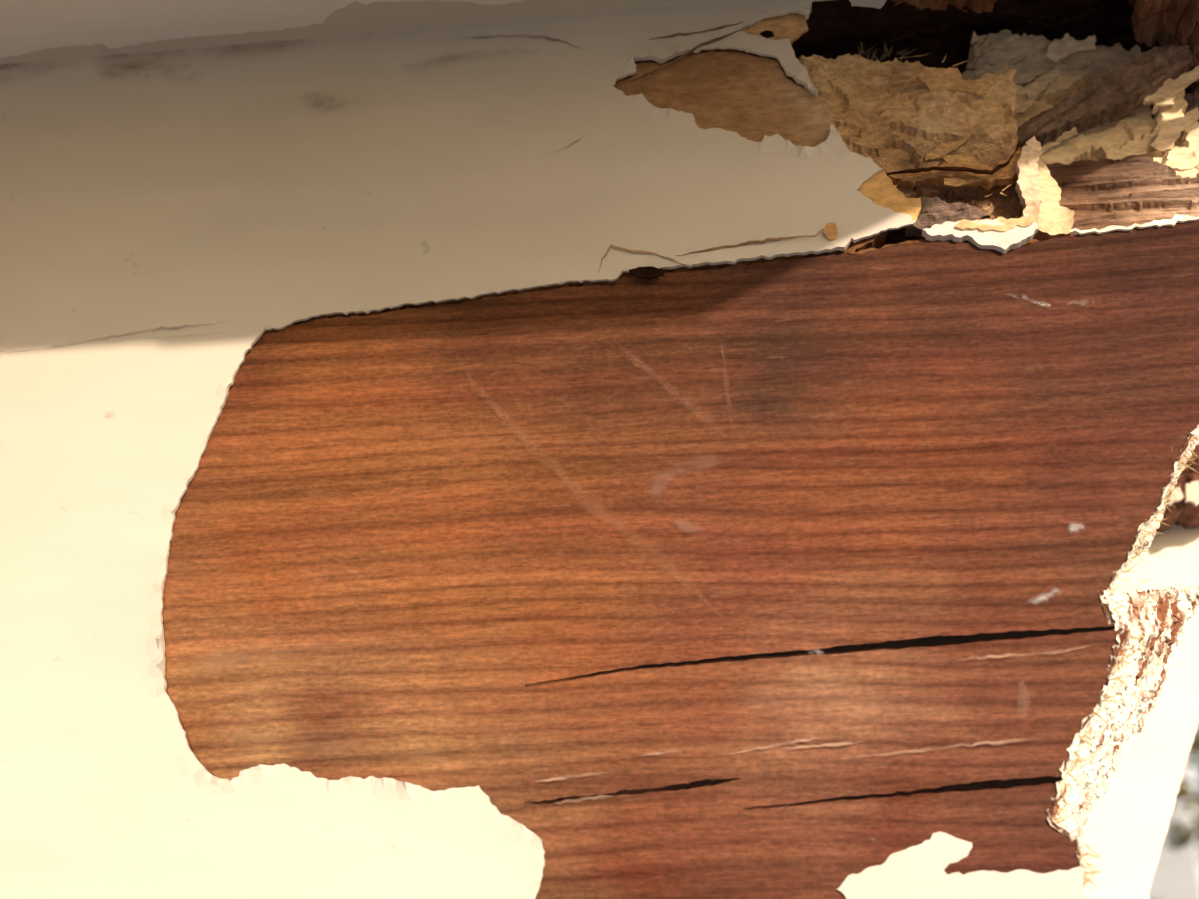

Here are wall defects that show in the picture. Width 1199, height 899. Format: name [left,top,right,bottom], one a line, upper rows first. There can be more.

peeling [742,13,808,45]
peeling [615,51,831,147]
peeling [916,30,1141,127]
peeling [1143,66,1199,184]
peeling [163,127,1199,899]
crack [525,626,1115,686]
crack [524,776,1063,809]